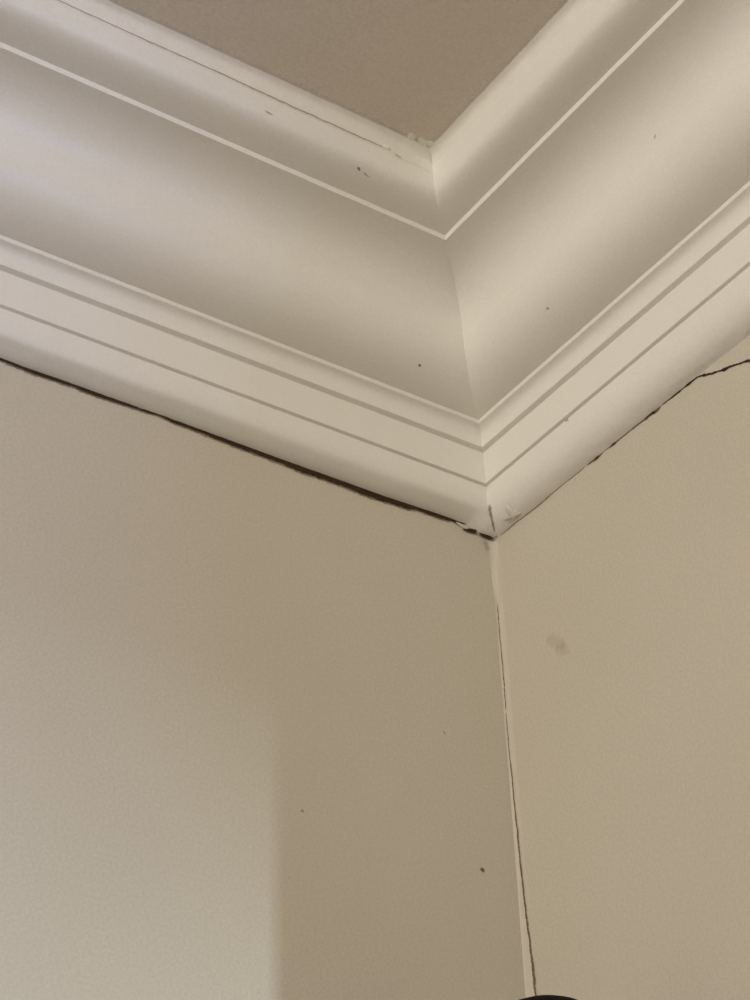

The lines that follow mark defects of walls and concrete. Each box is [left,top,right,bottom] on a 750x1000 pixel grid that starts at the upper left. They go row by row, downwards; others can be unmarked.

crack [0,358,466,527]
crack [489,359,750,534]
crack [497,606,537,996]